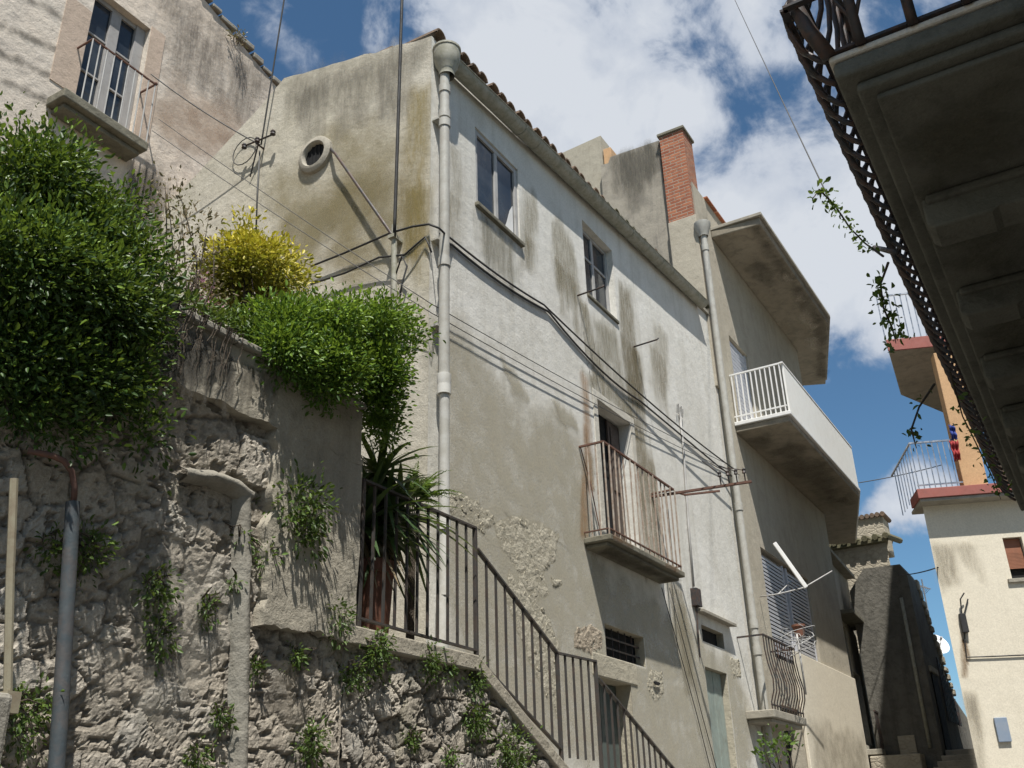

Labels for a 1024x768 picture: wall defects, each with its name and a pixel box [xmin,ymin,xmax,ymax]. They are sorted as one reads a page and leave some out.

peeling [450,334,750,768]
leakage [618,292,660,557]